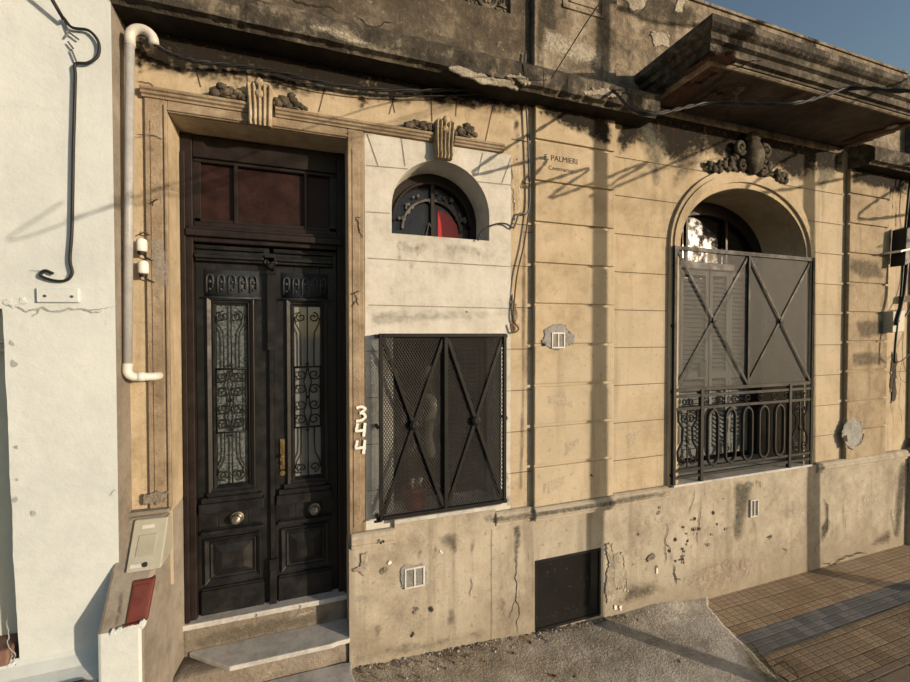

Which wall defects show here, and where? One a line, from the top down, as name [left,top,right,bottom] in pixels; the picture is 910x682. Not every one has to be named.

spalling [448,66,531,91]
crack [7,305,114,317]
leakage [735,483,751,537]
crack [815,499,867,566]
crack [510,560,520,629]
crack [6,618,16,663]